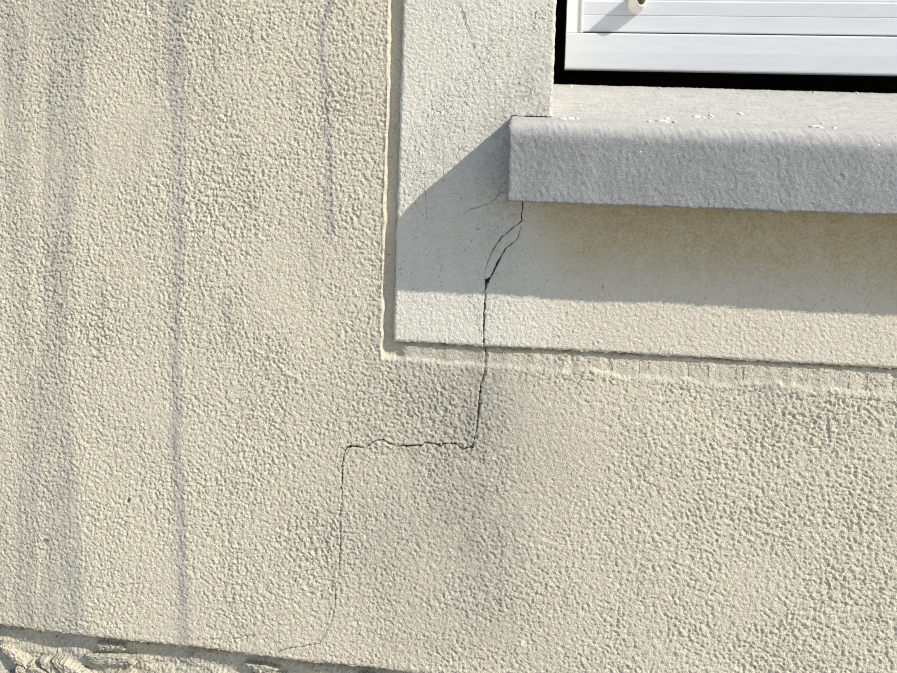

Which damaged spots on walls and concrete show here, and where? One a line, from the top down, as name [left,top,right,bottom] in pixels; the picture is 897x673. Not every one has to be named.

water stain [0,0,119,673]
water stain [141,0,199,673]
water stain [318,0,336,238]
crack [279,202,523,651]